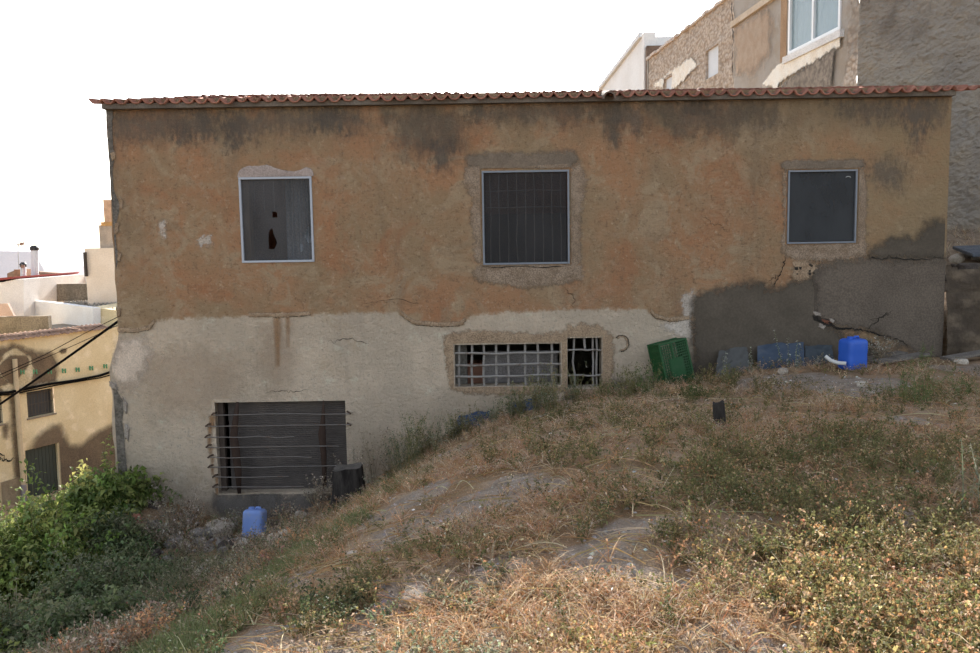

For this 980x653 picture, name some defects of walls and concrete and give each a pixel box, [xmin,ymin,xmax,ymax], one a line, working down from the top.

crack [813,310,908,347]